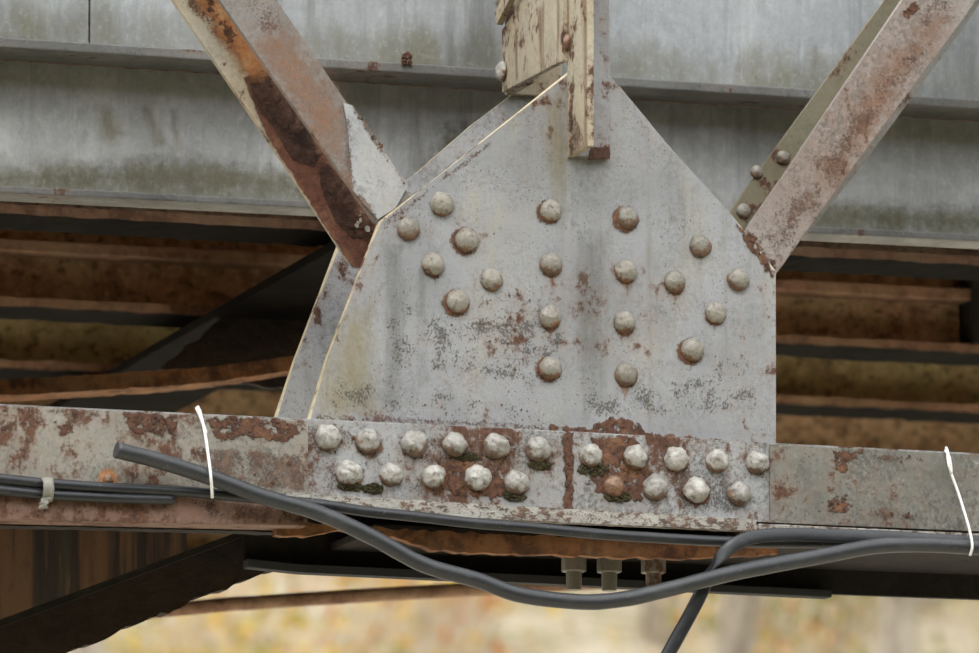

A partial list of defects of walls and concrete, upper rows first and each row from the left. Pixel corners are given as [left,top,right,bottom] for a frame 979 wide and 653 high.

corrosion [903,0,953,33]
corrosion [188,0,405,268]
corrosion [736,48,923,277]
corrosion [450,227,476,256]
corrosion [442,289,466,317]
corrosion [676,337,699,365]
corrosion [48,410,100,436]
corrosion [123,410,178,436]
corrosion [195,415,710,509]
corrosion [833,448,863,473]
corrosion [828,494,852,513]